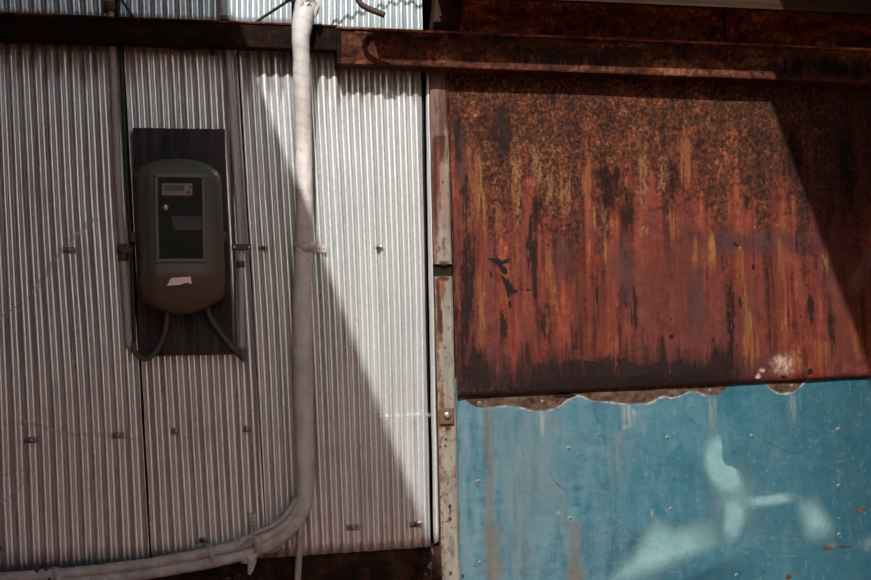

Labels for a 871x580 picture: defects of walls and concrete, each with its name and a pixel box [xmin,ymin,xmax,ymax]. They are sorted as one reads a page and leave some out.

corrosion [432,135,445,227]
corrosion [457,145,502,235]
corrosion [511,149,521,229]
corrosion [532,146,570,210]
corrosion [579,158,592,198]
corrosion [638,151,648,206]
corrosion [678,137,691,185]
corrosion [693,237,715,265]
corrosion [436,276,448,337]
corrosion [476,271,485,344]
corrosion [736,249,758,363]
peeling [465,383,729,412]